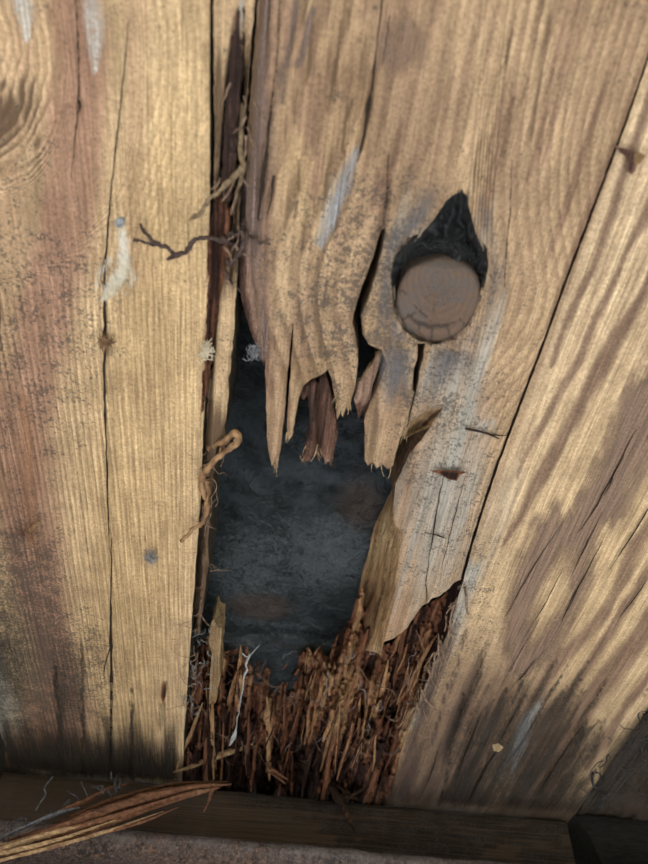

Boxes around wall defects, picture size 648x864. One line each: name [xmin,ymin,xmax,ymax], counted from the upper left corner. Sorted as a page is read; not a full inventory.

crack [504,160,513,287]
crack [100,21,129,774]
peeling [430,470,466,481]